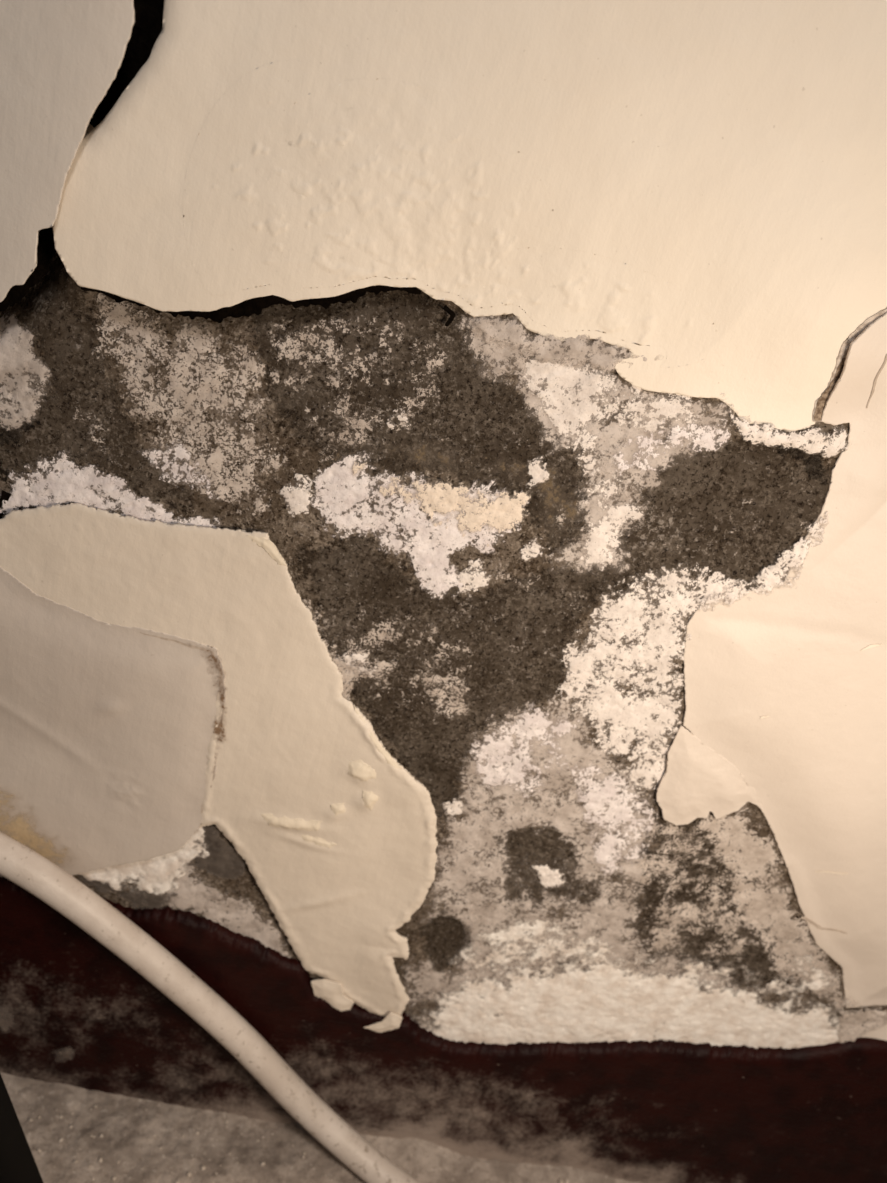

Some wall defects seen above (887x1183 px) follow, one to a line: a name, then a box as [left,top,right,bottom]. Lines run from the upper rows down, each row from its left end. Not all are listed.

peeling [0,0,135,450]
crack [89,0,164,128]
crack [813,309,887,422]
water stain [0,244,856,1049]
peeling [0,287,887,1043]